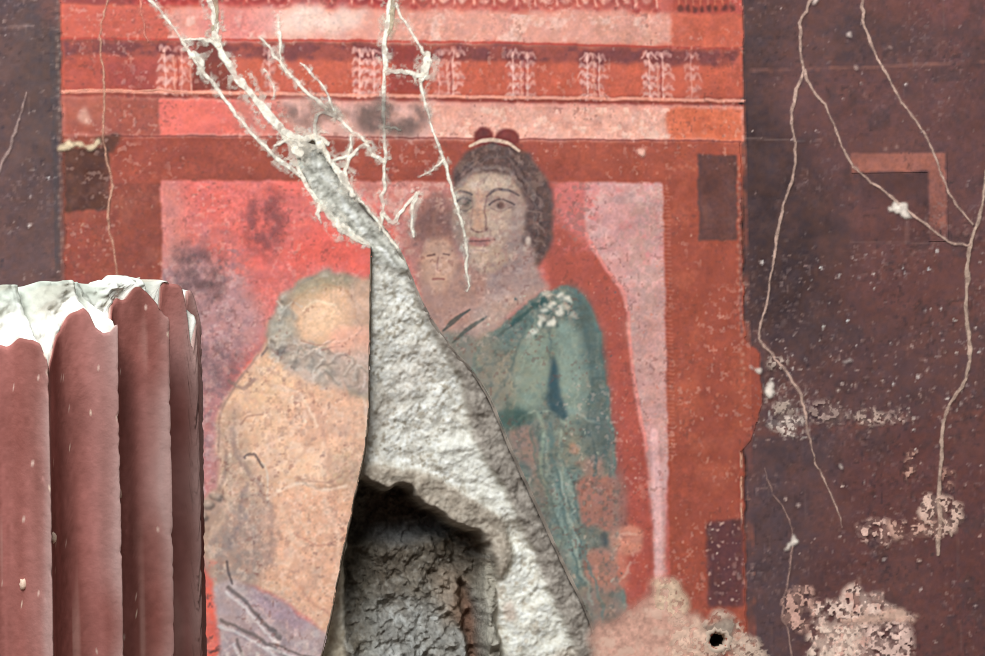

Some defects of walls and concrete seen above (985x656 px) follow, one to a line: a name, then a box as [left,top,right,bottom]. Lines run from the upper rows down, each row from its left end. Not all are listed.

crack [0,102,24,170]
crack [85,0,114,243]
crack [140,0,470,287]
spalling [295,139,767,656]
crack [758,0,985,556]
peeling [782,583,913,656]